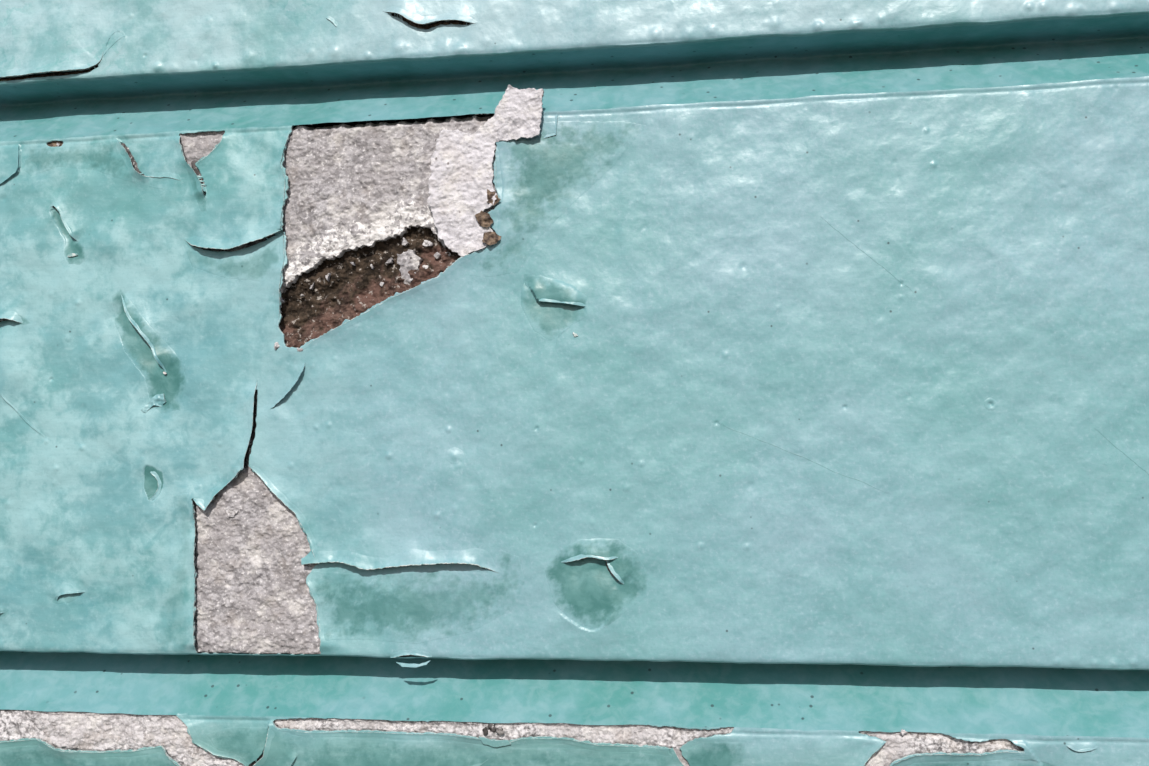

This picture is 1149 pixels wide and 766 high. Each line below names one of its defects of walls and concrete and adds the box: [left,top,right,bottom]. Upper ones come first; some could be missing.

peeling [24,131,229,211]
peeling [183,85,646,410]
crack [240,380,258,468]
peeling [156,465,525,668]
peeling [0,710,734,766]
peeling [854,729,1053,766]